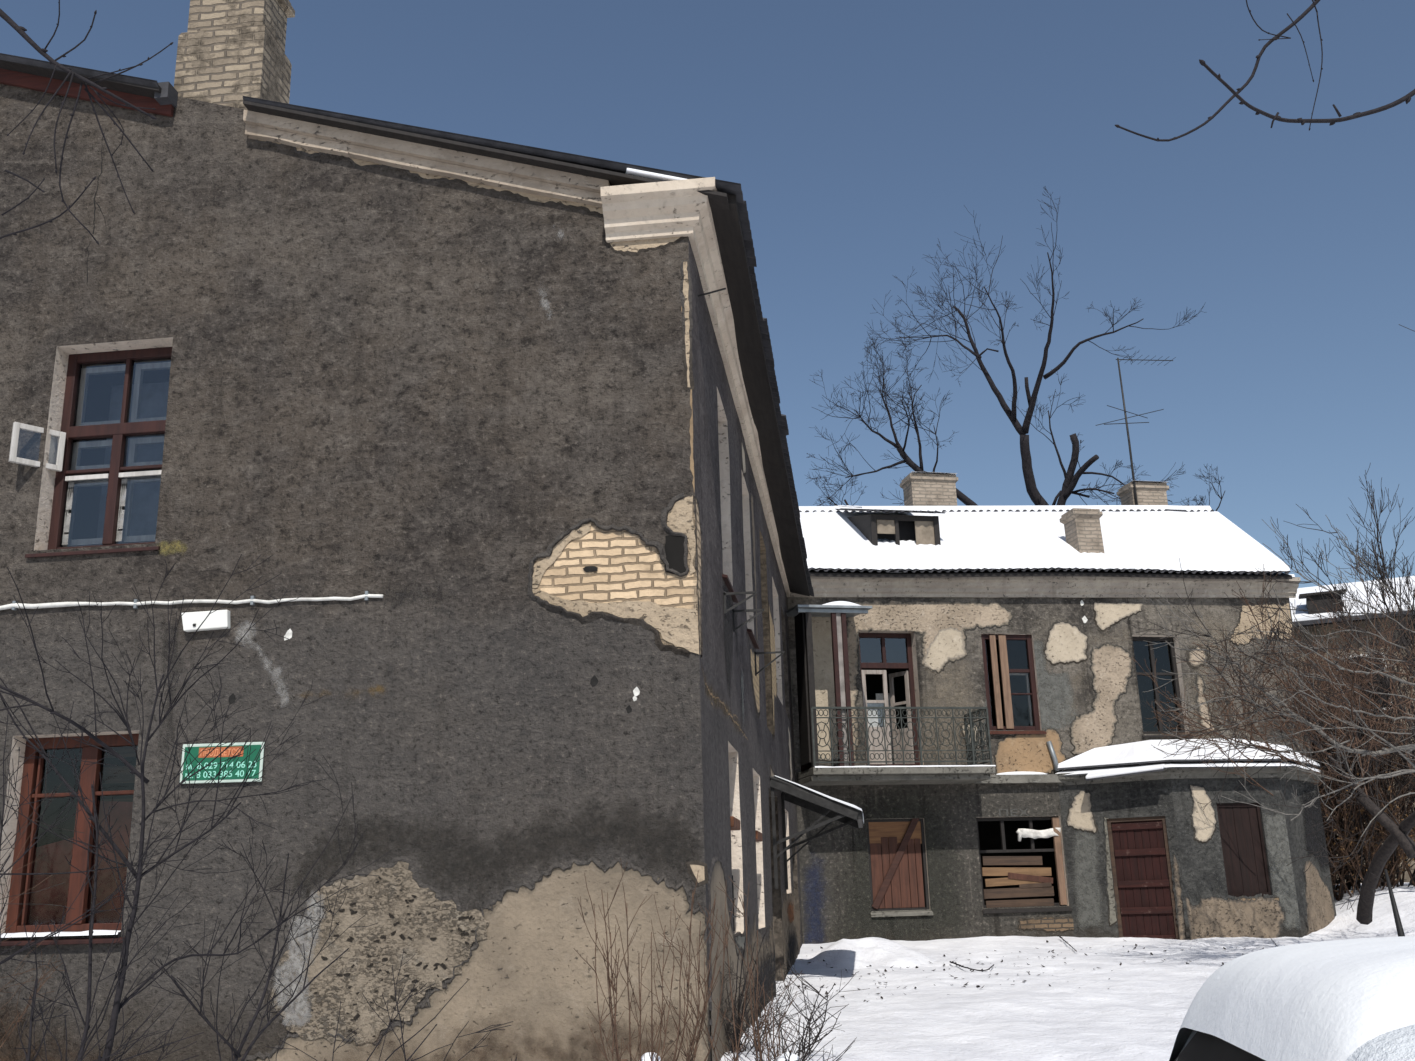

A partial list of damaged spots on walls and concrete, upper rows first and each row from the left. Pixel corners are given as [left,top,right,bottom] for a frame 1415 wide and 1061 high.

flaking render [527,493,703,658]
spalling [812,600,1014,761]
spalling [993,600,1143,775]
spalling [1228,603,1293,646]
damp [275,811,698,1026]
spalling [244,855,747,1061]
spalling [1066,790,1118,927]
spalling [1188,784,1217,843]
spalling [1171,851,1286,940]